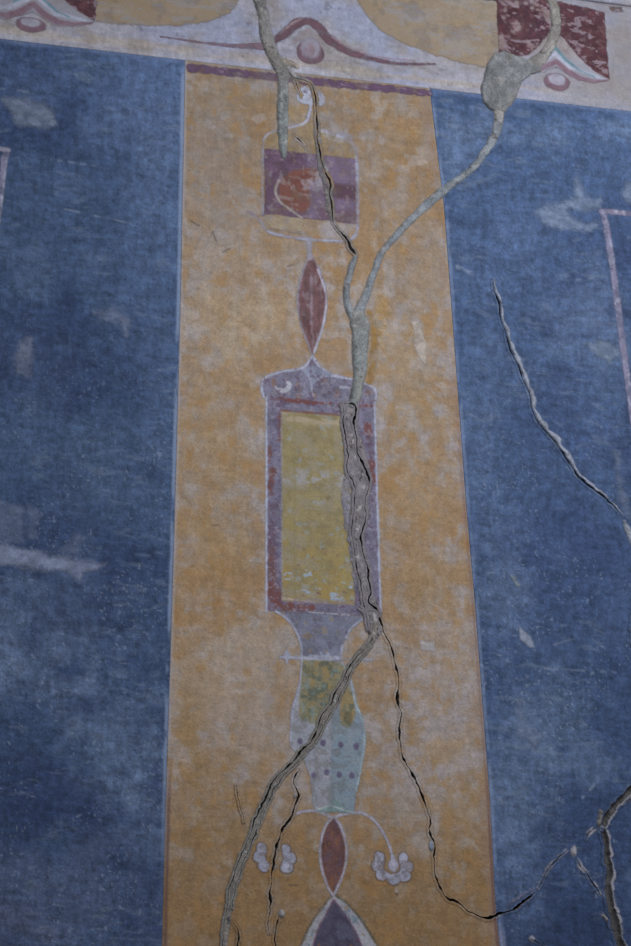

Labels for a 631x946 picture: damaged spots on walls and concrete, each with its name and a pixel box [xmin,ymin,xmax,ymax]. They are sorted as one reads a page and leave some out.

crack [219,0,631,946]